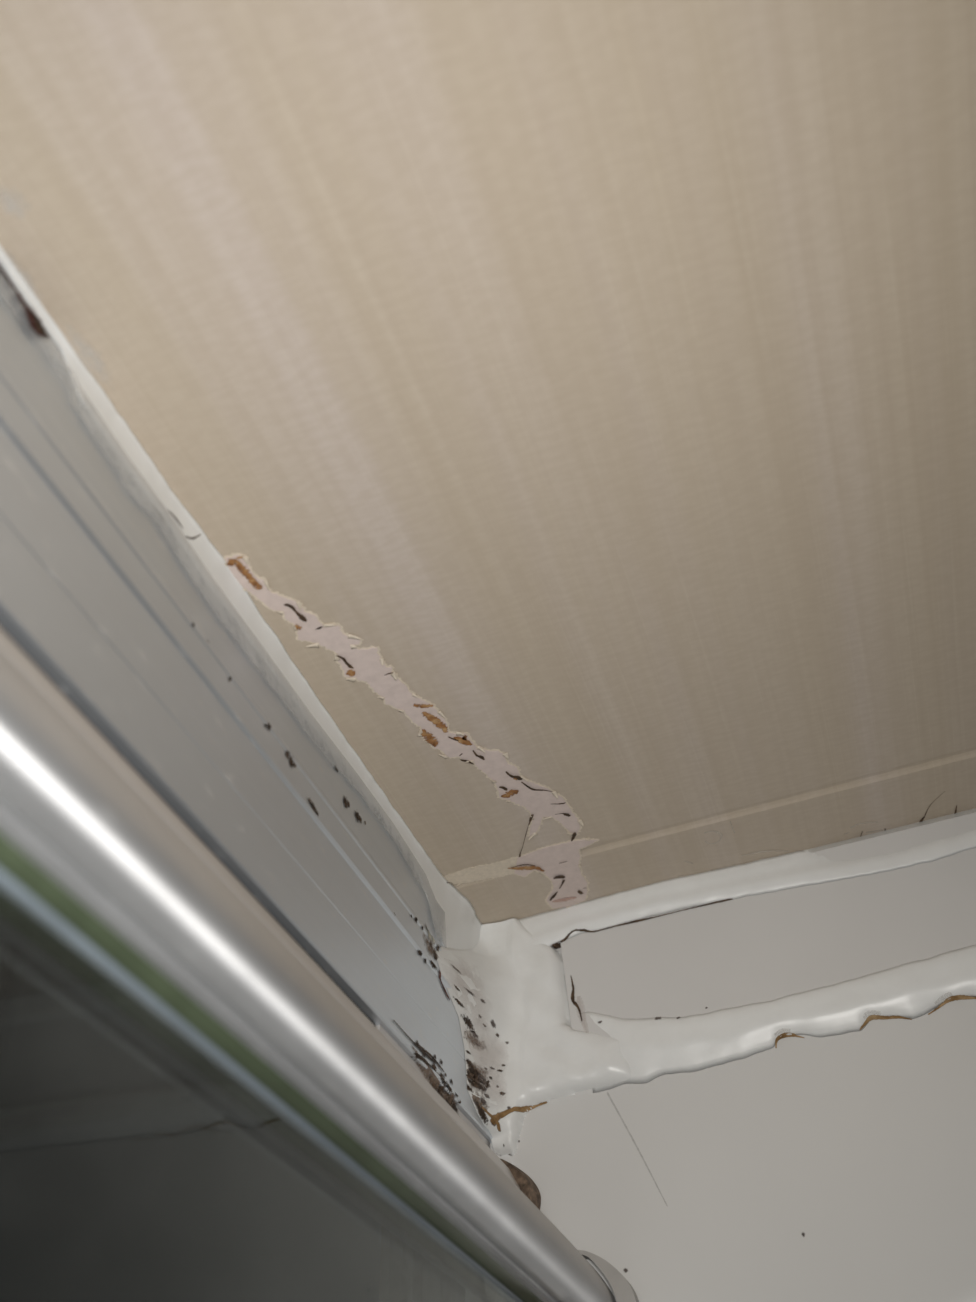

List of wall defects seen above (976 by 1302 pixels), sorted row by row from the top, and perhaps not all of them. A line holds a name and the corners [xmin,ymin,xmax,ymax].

damp [0,266,49,338]
peeling [223,553,599,909]
crack [552,898,732,949]
damp [393,915,520,1146]
crack [571,977,582,1021]